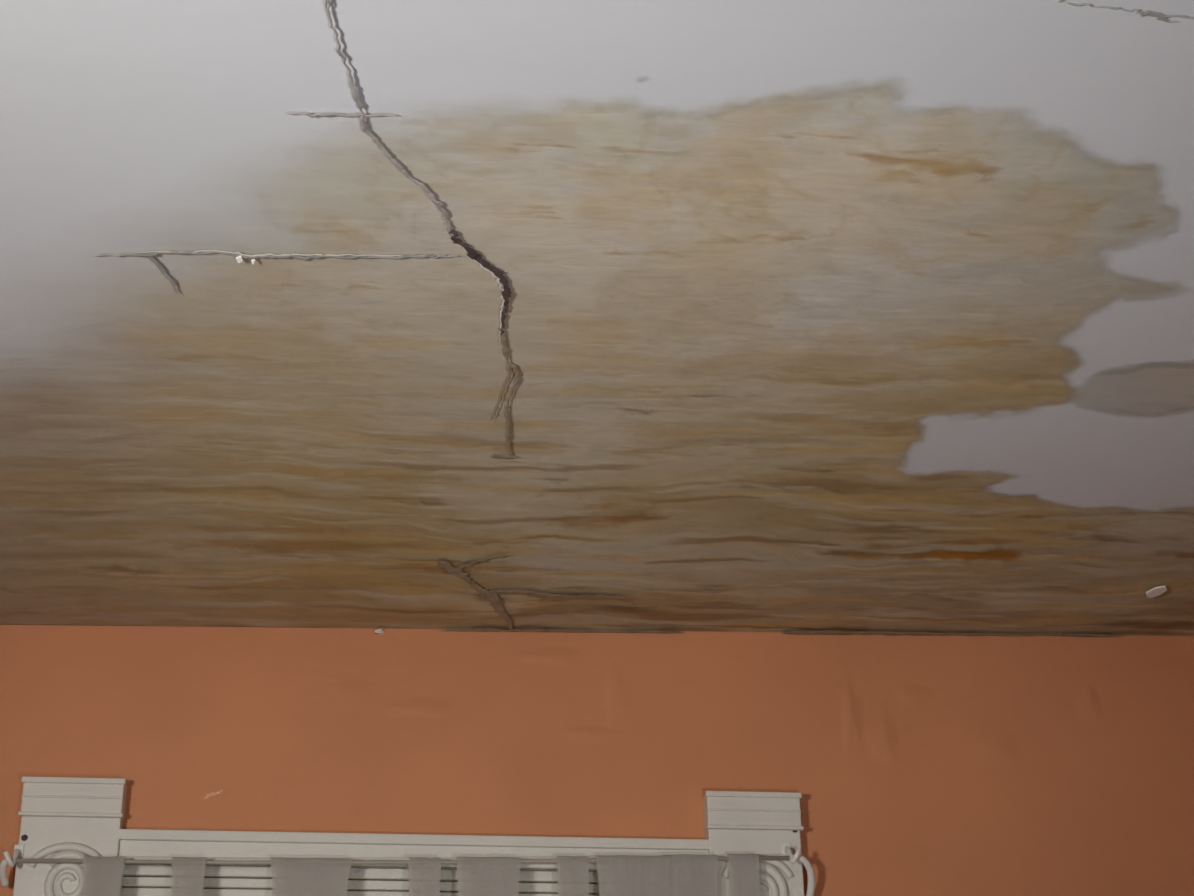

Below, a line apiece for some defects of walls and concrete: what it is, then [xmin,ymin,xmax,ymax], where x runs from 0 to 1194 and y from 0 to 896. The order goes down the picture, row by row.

crack [90,0,520,459]
water stain [0,85,1194,636]
crack [1067,3,1194,23]